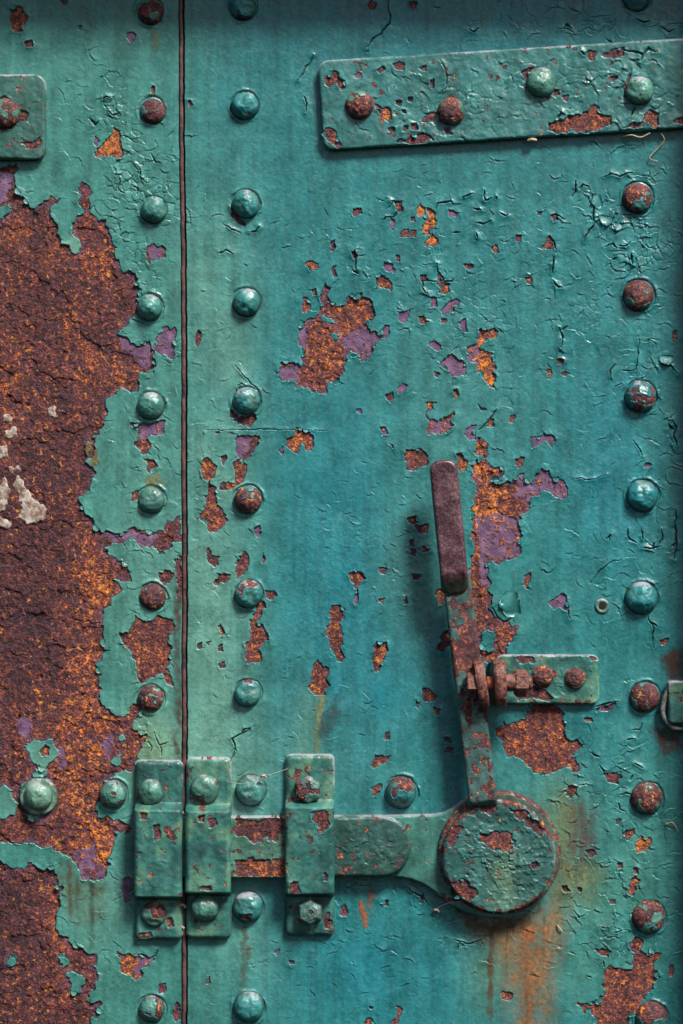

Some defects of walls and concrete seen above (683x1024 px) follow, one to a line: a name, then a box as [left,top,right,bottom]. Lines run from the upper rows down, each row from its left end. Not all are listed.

rust [548,106,611,134]
crack [572,173,632,262]
peeling [302,289,317,312]
peeling [397,297,498,388]
peeling [130,420,165,472]
peeling [221,433,261,465]
rust [0,162,182,896]
peeling [456,405,569,663]
rust [476,829,516,852]
rust [481,806,546,836]
peeling [117,952,157,980]
rust [452,878,558,1024]